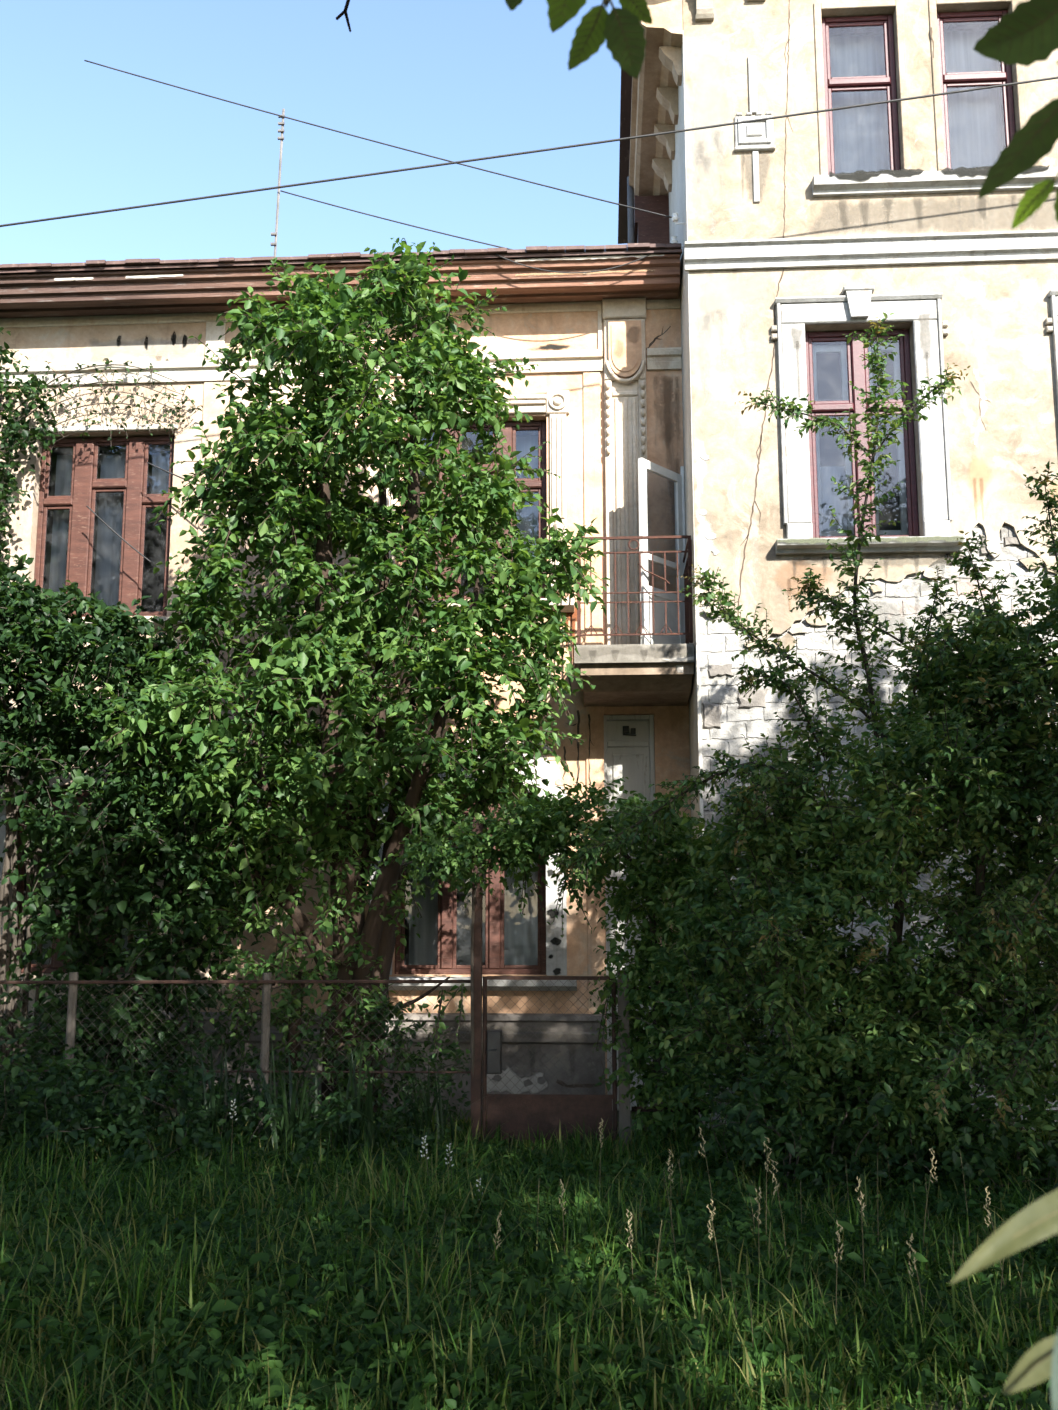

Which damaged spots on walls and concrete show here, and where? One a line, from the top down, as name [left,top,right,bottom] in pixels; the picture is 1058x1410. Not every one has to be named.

crack [738,0,793,615]
flaking render [695,441,1058,846]
flaking render [824,817,1055,980]
flaking render [487,1068,548,1094]
flaking render [968,1061,1058,1131]